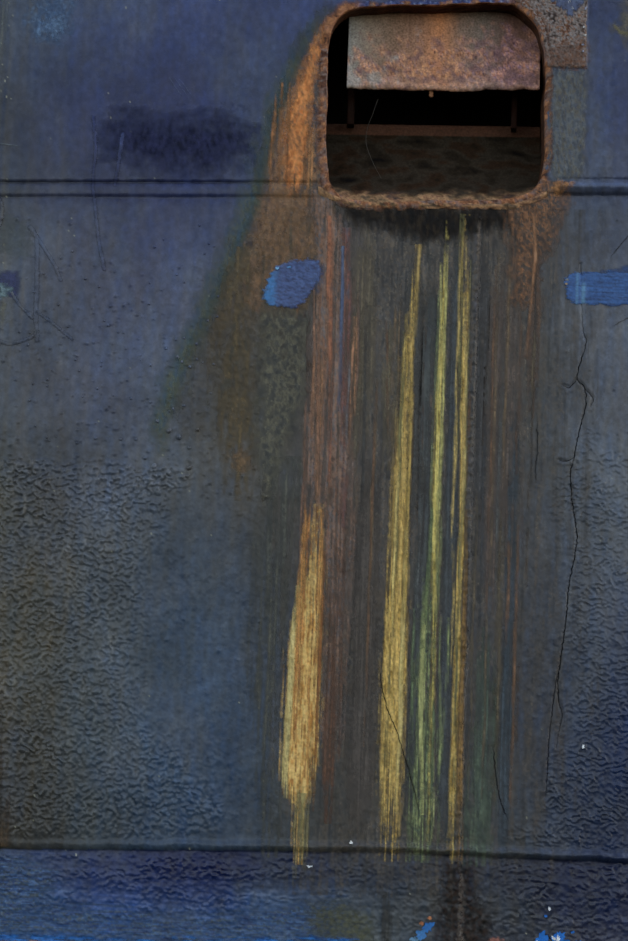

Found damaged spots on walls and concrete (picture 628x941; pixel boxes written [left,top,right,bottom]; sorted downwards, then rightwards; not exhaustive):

rust [154,26,359,700]
crack [546,304,594,791]
peeling [535,930,581,941]